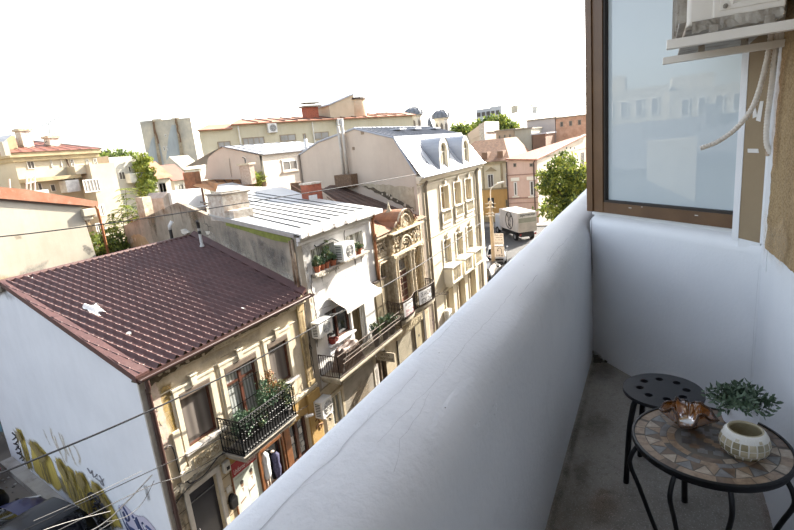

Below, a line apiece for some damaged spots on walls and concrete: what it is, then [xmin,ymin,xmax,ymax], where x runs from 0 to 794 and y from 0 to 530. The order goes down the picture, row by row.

crack [305,275,331,378]
crack [260,439,349,530]